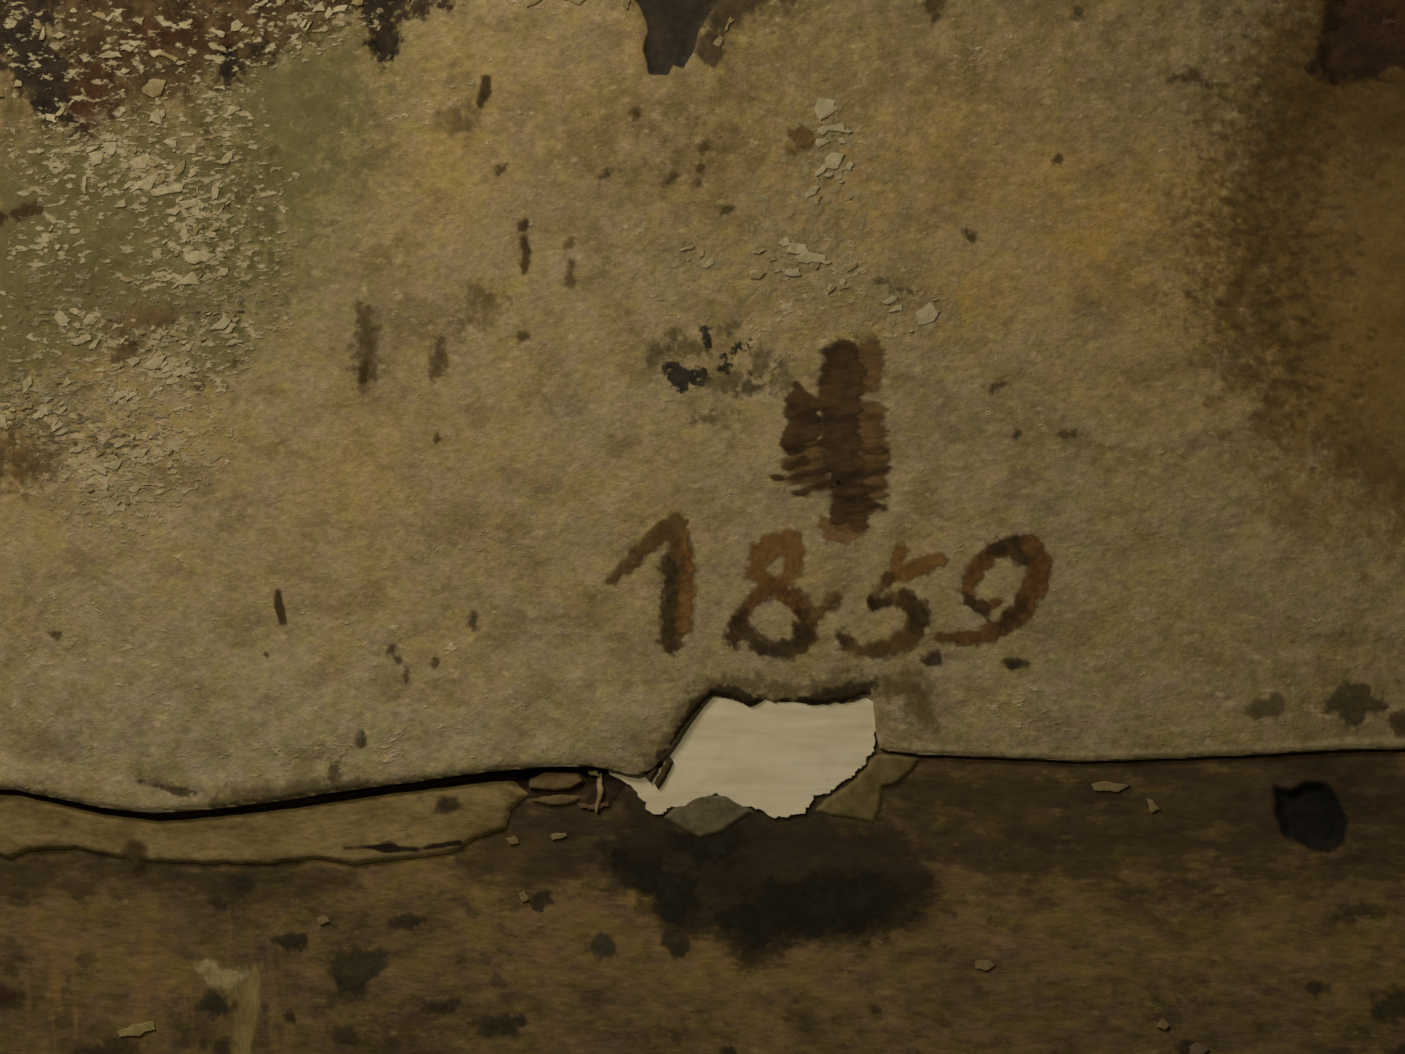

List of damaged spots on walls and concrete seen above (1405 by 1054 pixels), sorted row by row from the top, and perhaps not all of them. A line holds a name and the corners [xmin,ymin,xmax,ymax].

peeling [0,0,453,545]
leakage [1218,0,1405,522]
crack [139,767,587,813]
flaking render [0,679,1405,865]
leakage [661,930,689,957]